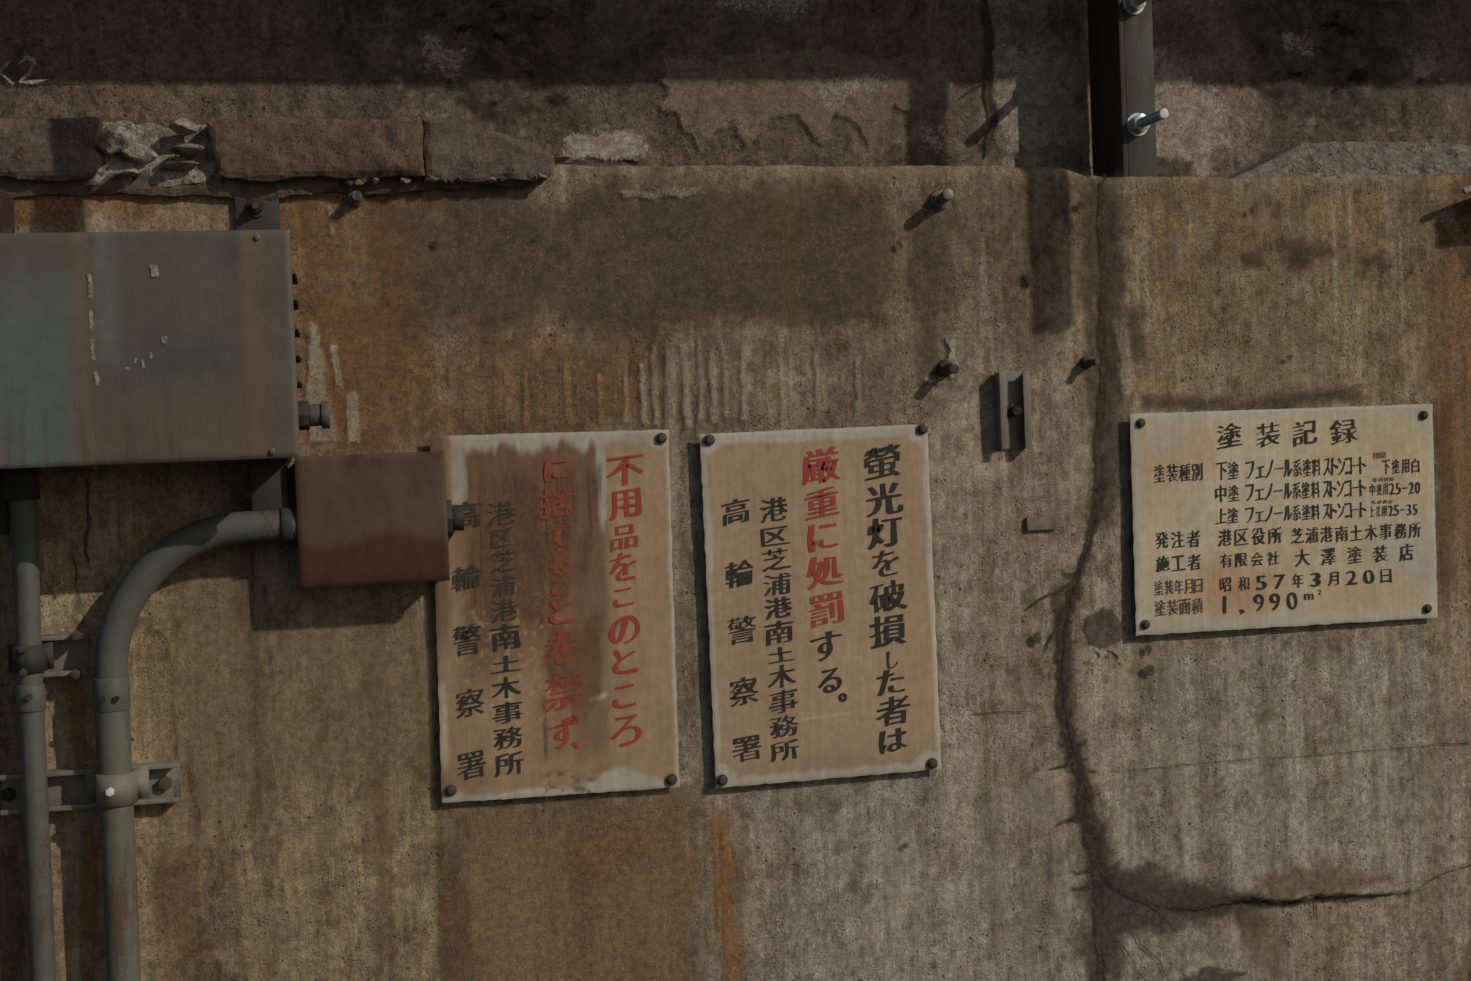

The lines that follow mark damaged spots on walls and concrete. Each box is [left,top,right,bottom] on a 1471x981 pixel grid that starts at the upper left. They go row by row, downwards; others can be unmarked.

efflorescence [561,124,649,162]
efflorescence [622,185,704,199]
crack [961,0,1004,157]
water stain [1084,181,1132,520]
crack [968,173,1470,981]
water stain [1049,583,1265,981]